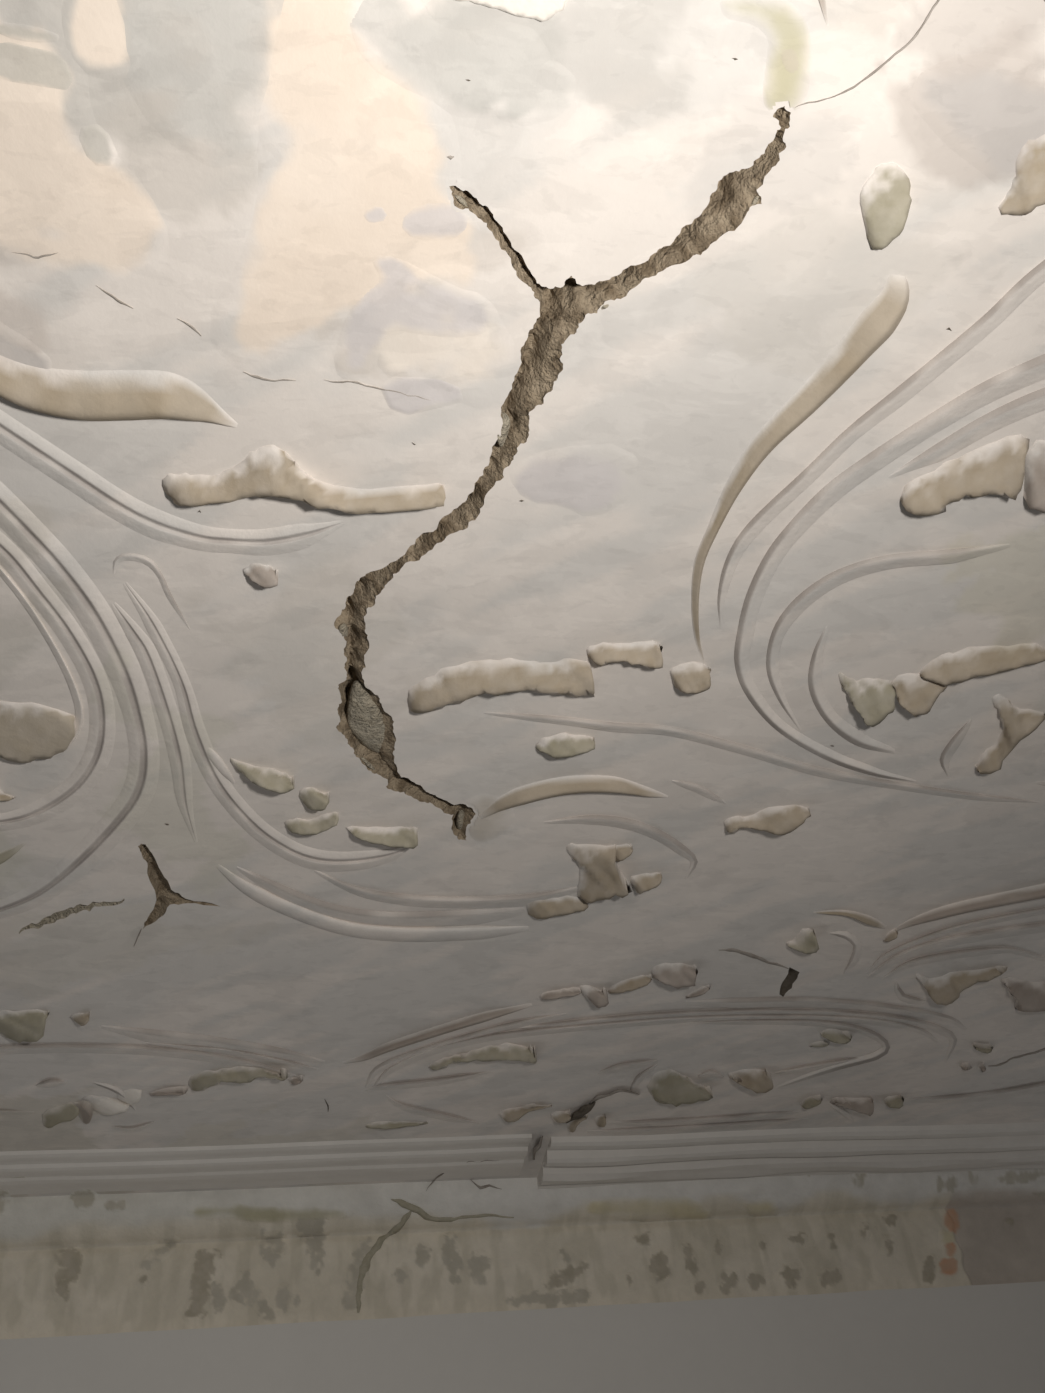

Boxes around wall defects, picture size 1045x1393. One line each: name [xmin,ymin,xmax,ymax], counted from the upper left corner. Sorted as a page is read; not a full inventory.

damp [720,0,812,111]
peeling [0,0,576,415]
crack [97,286,132,308]
crack [244,372,428,400]
crack [334,0,940,840]
crack [719,949,799,997]
crack [532,1089,640,1160]
damp [136,1200,376,1326]
crack [355,1160,514,1313]
damp [390,1231,494,1289]
damp [503,1246,595,1310]
damp [585,1190,845,1300]